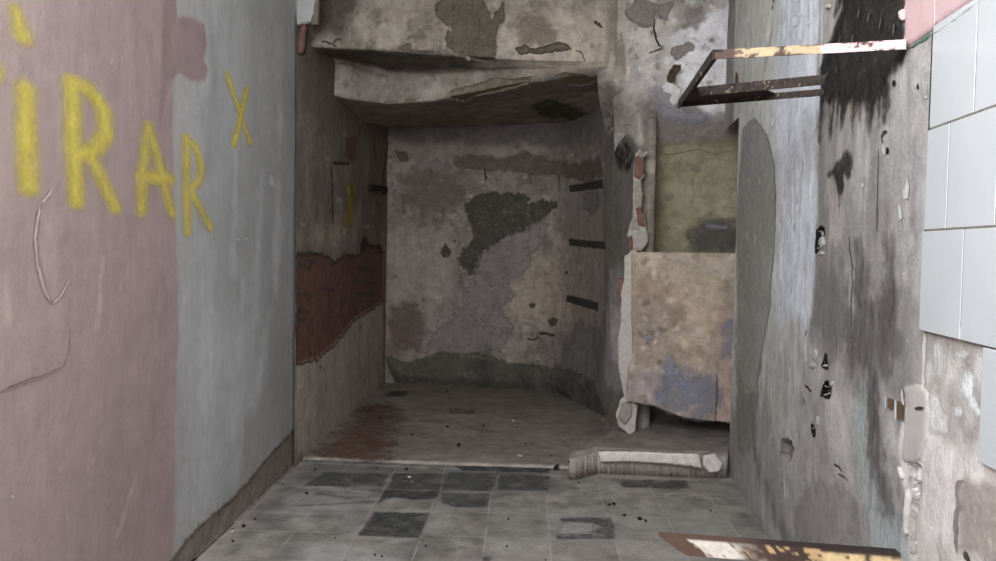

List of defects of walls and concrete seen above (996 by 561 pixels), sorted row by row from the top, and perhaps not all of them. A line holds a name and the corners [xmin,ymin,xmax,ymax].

flaking render [397,0,506,63]
flaking render [445,76,532,103]
flaking render [624,0,674,28]
flaking render [662,41,695,106]
water stain [818,0,890,142]
crack [2,329,71,392]
crack [33,188,69,304]
flaking render [295,236,385,366]
flaking render [426,190,558,361]
flaking render [616,250,638,434]
water stain [818,226,915,511]
flaking render [957,480,996,561]